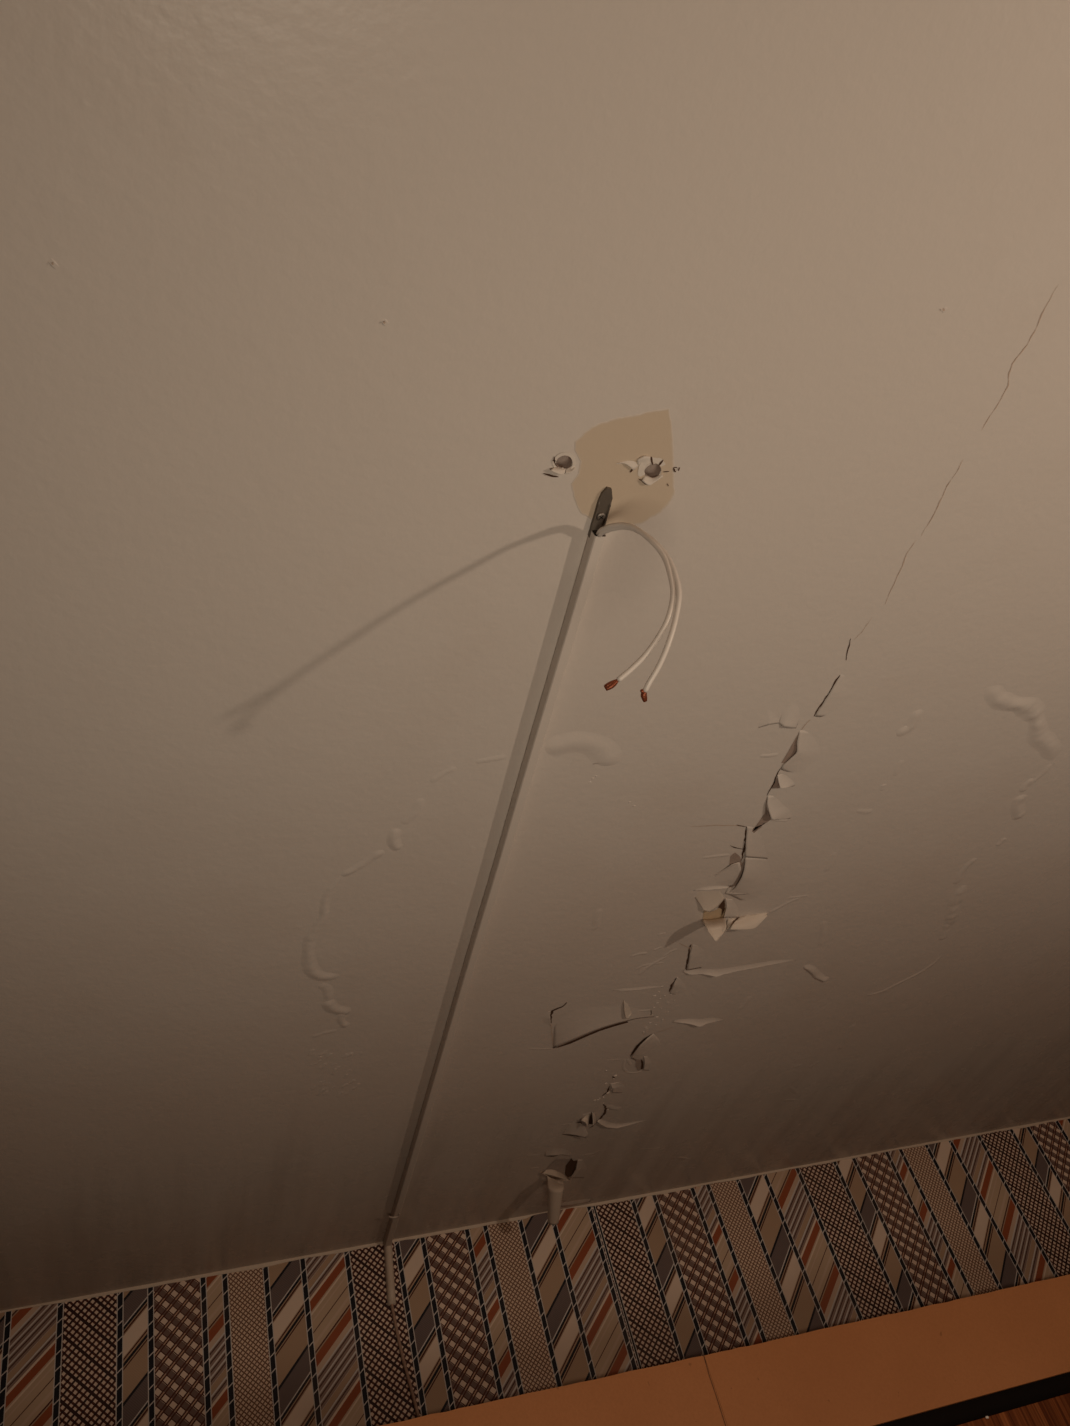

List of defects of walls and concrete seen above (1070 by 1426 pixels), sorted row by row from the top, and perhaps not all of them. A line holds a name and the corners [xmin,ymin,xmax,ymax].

crack [984,292,1054,426]
crack [802,462,962,729]
peeling [691,703,821,941]
peeling [683,960,830,982]
peeling [520,1001,723,1225]